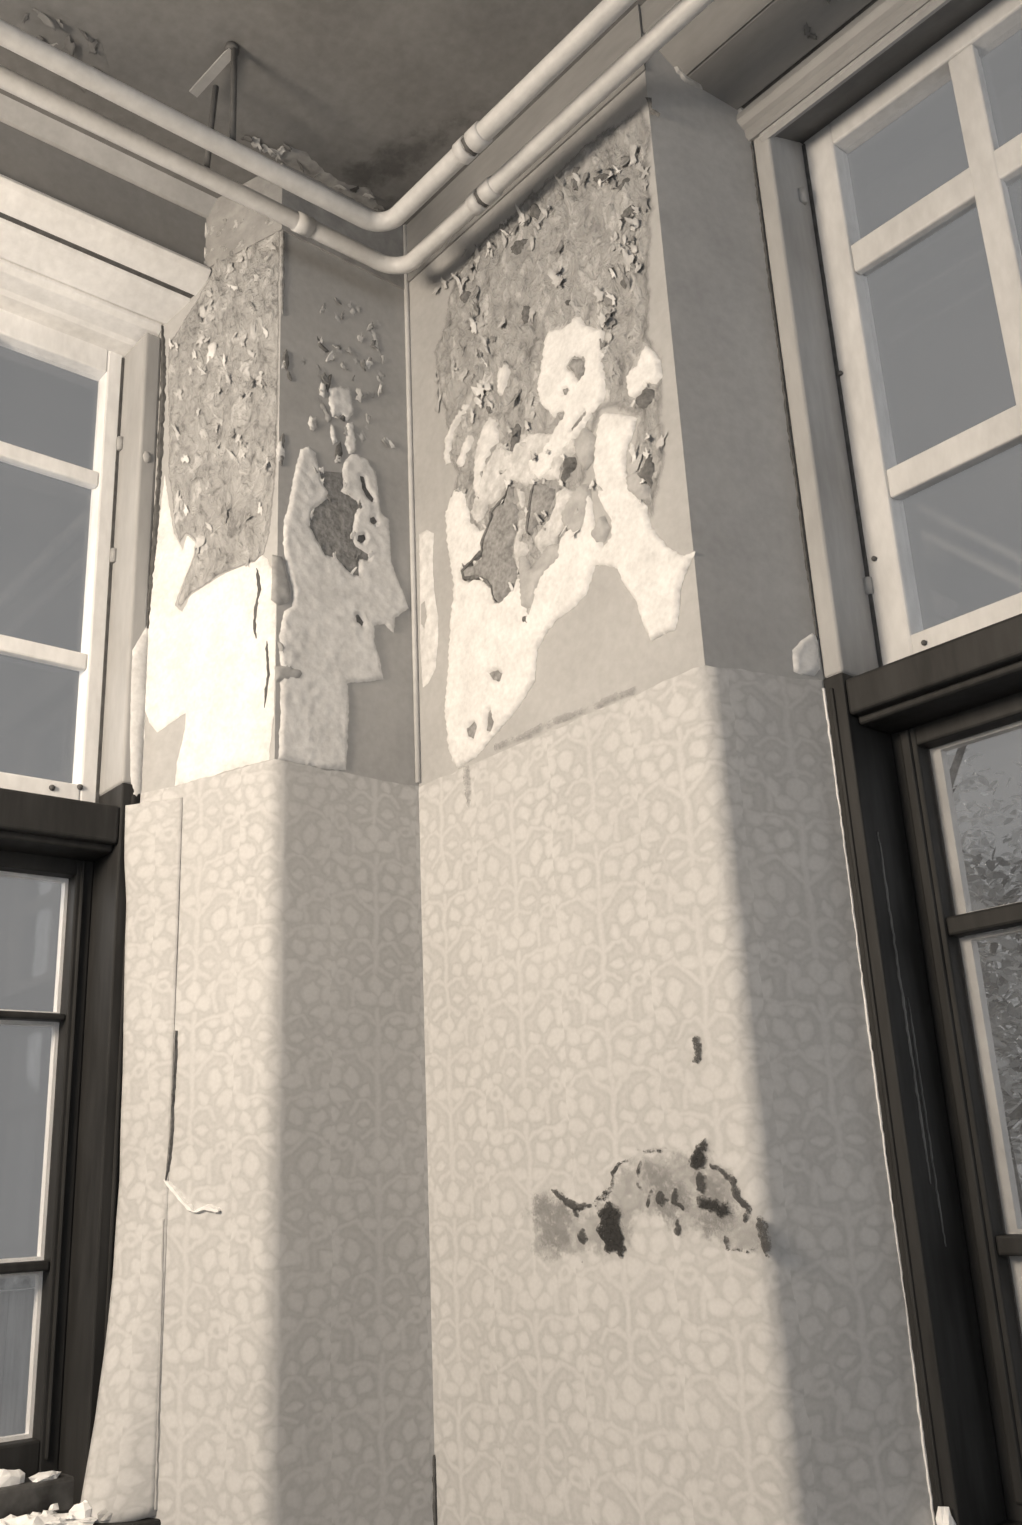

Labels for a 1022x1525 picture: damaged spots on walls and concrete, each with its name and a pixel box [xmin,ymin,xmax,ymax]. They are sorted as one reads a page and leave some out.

peeling [130,97,695,796]
crack [253,568,270,708]
flaking render [792,633,820,676]
crack [164,1030,222,1214]
crack [431,1455,439,1525]